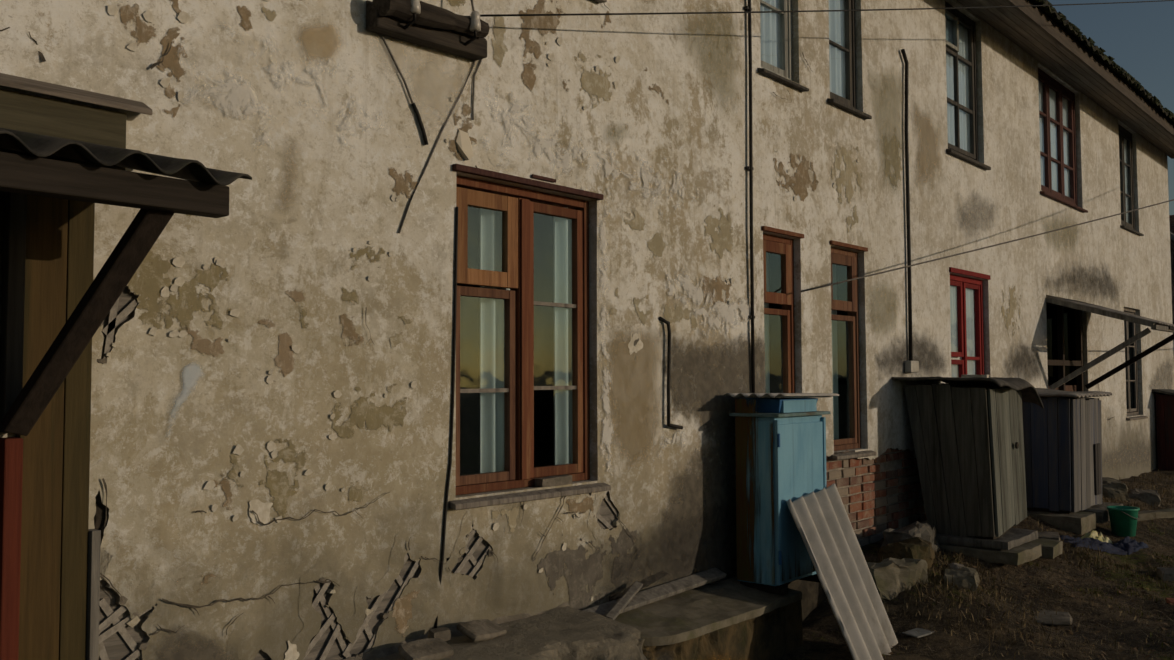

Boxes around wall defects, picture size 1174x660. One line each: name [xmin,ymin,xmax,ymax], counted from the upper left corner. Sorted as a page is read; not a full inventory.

peeling [107,0,191,117]
peeling [519,0,565,91]
water stain [492,94,699,221]
peeling [773,143,863,233]
water stain [600,210,609,289]
peeling [91,250,240,382]
spalling [88,459,185,660]
crack [152,580,339,635]
crack [251,492,389,526]
spalling [254,504,528,660]
water stain [599,267,766,595]
spalling [826,430,927,548]